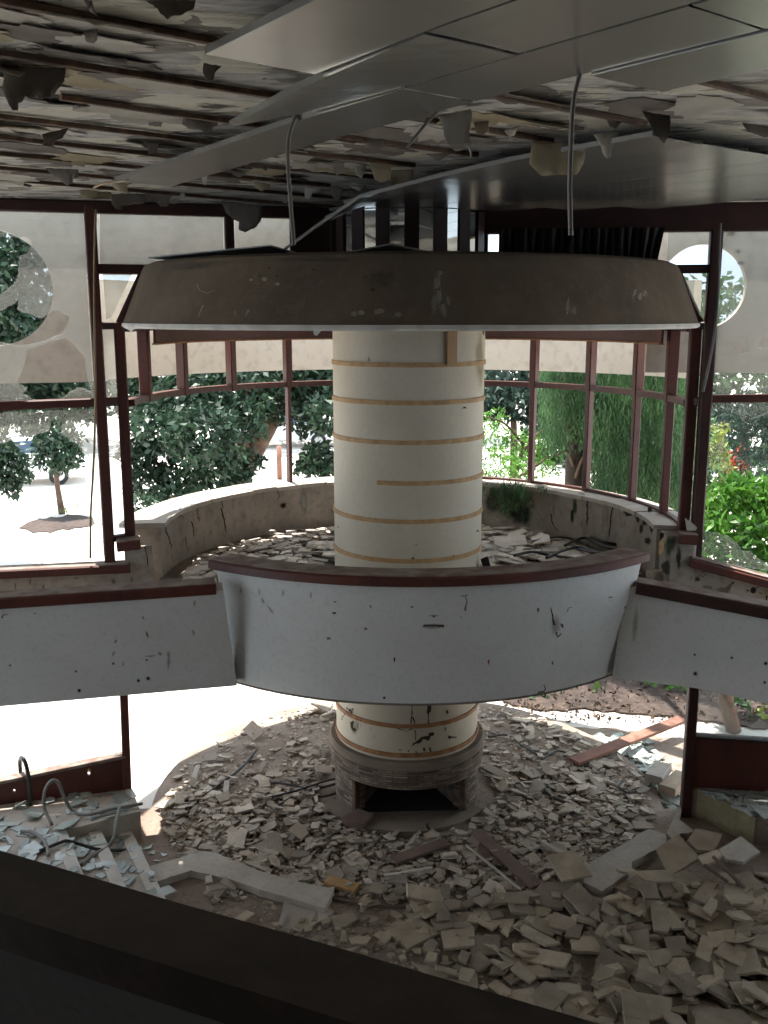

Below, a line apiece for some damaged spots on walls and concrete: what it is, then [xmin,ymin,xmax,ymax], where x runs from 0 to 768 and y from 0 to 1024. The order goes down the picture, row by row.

peeling [0,0,241,210]
peeling [191,85,744,202]
peeling [742,123,768,138]
crack [144,501,227,566]
crack [586,501,613,536]
peeling [399,706,434,753]